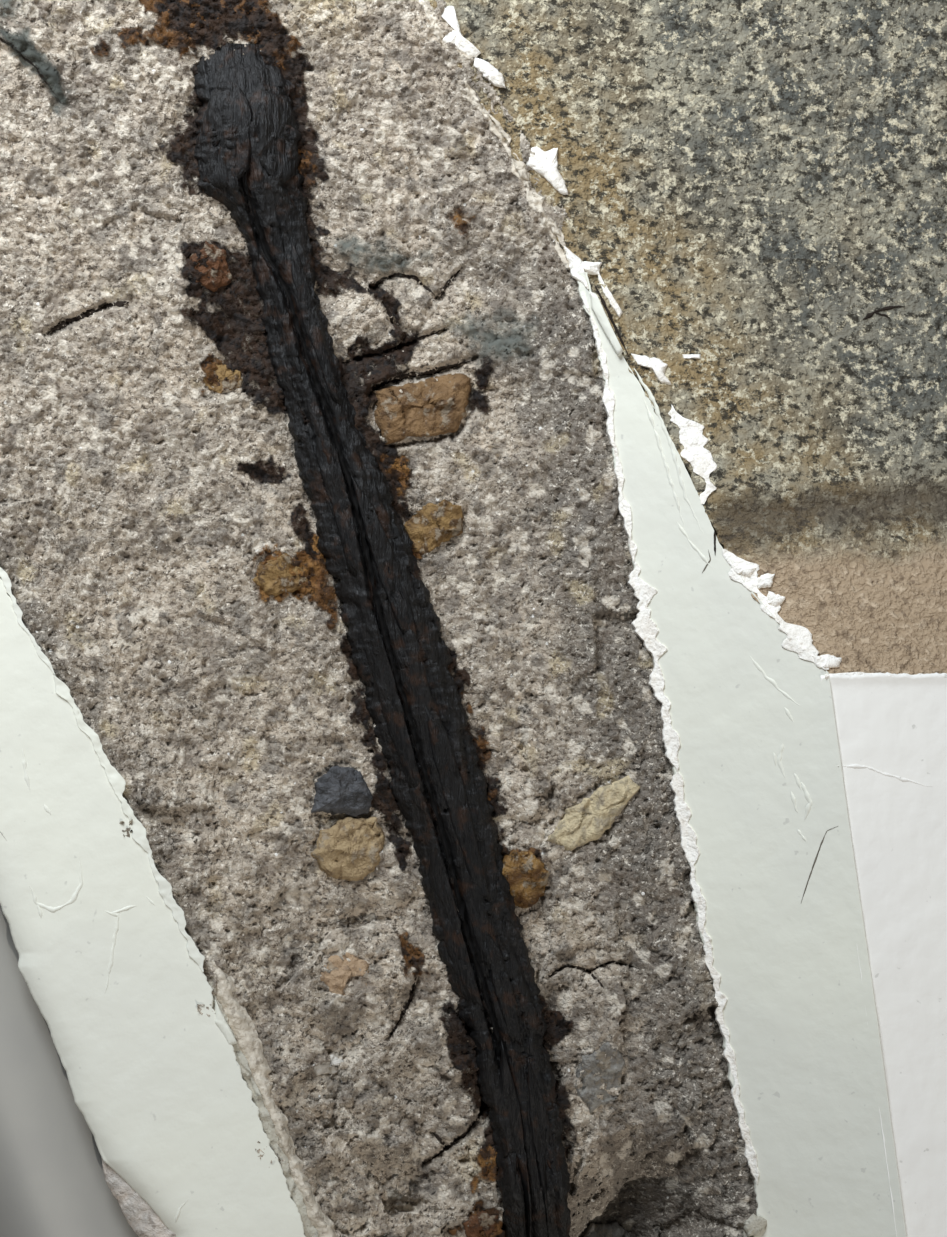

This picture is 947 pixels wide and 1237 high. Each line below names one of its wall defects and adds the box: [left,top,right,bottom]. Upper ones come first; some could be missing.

crack [0,37,61,103]
crack [47,301,129,335]
corrosion [91,0,420,522]
corrosion [469,357,494,413]
spalling [0,0,504,1237]
corrosion [252,504,424,872]
corrosion [448,647,547,862]
spalling [258,0,767,1237]
corrosion [397,932,429,978]
corrosion [438,1002,505,1237]
corrosion [538,995,574,1065]
corrosion [555,1079,577,1155]